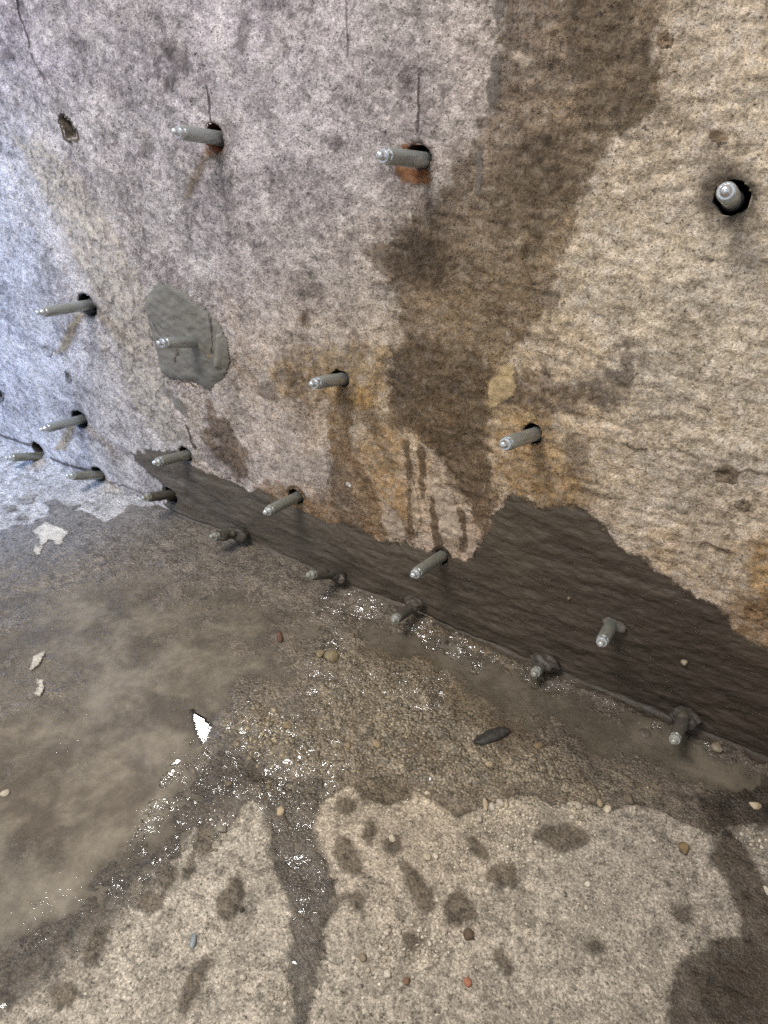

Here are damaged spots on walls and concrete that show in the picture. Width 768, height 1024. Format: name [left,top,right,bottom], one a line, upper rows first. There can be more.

rust [396,166,431,185]
water stain [365,0,667,551]
rust [259,339,408,536]
water stain [327,386,387,540]
water stain [0,494,768,1024]